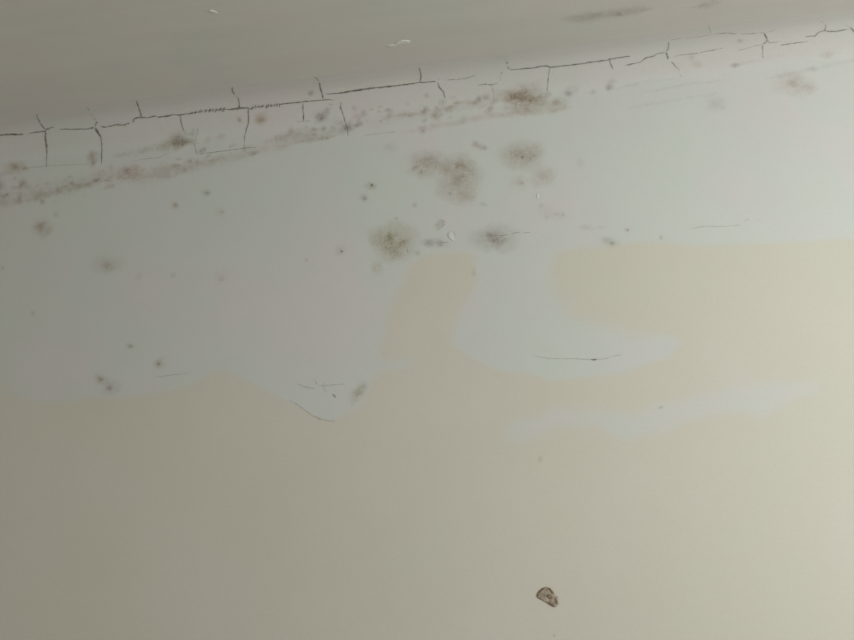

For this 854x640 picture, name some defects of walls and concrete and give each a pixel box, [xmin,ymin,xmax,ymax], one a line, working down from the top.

crack [133,68,441,129]
crack [10,119,102,166]